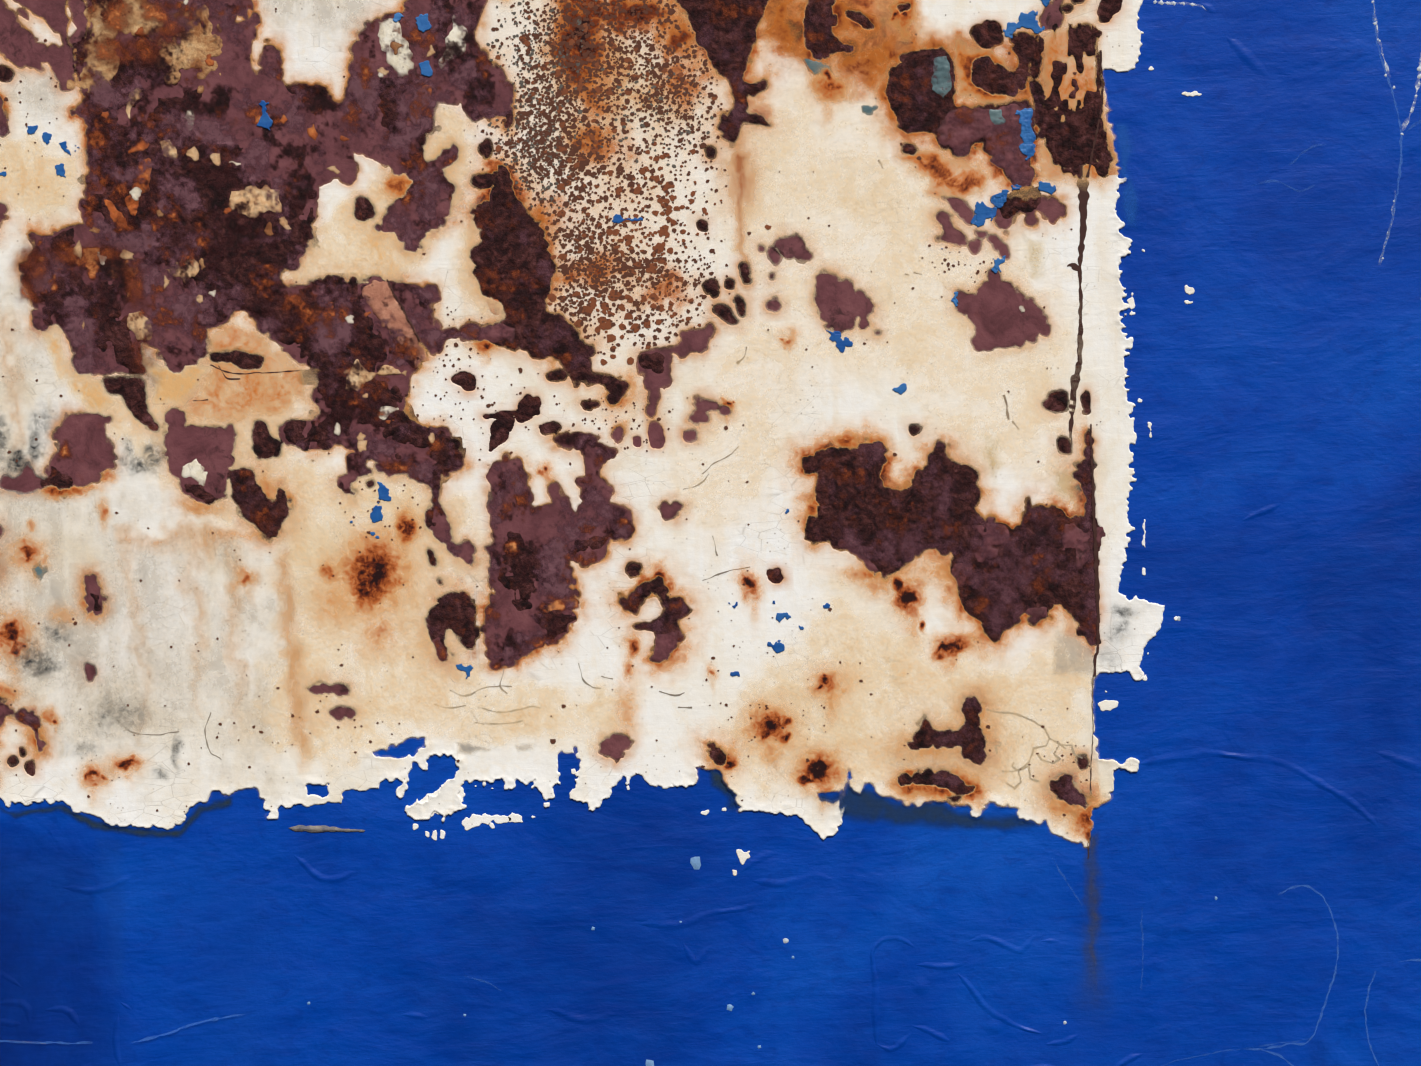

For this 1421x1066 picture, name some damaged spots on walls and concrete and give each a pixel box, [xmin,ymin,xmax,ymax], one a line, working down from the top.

corrosion [0,0,1123,754]
peeling [0,0,1194,848]
crack [986,50,1104,859]
corrosion [0,684,58,776]
corrosion [701,661,846,797]
corrosion [891,686,1000,806]
corrosion [1020,741,1099,841]
peeling [732,849,750,876]